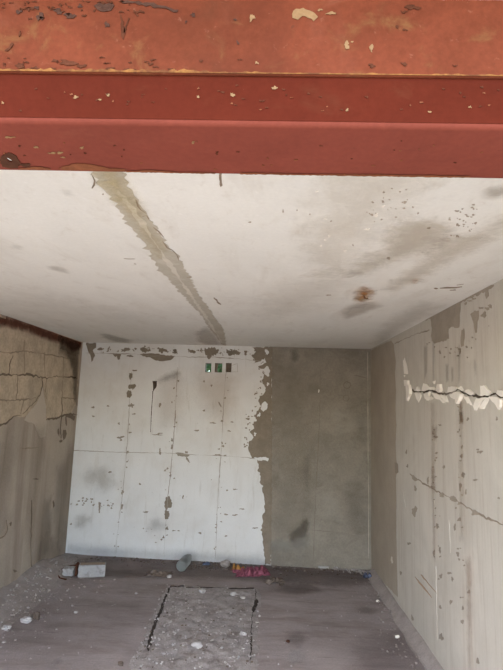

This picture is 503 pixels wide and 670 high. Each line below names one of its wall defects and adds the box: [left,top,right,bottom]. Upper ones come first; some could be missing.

peeling [2,0,178,39]
peeling [292,8,335,21]
peeling [429,289,492,358]
crack [0,340,76,436]
flaking render [0,314,178,442]
peeling [90,171,273,565]
crack [403,358,503,410]
crack [410,474,503,525]
crack [147,585,259,660]